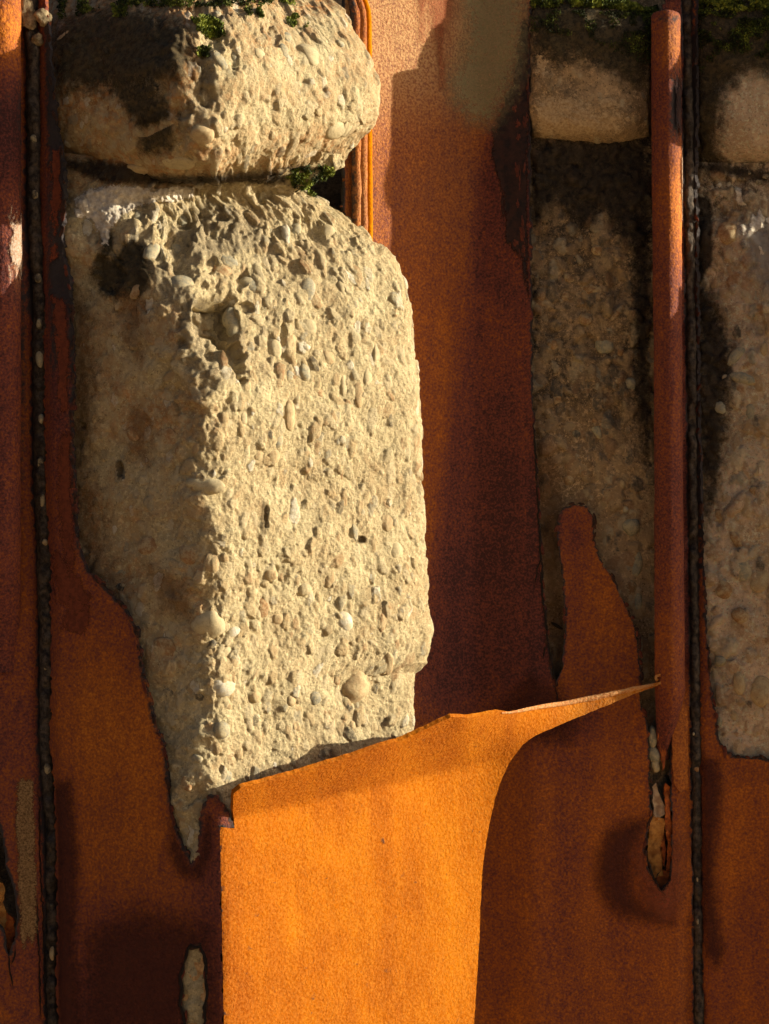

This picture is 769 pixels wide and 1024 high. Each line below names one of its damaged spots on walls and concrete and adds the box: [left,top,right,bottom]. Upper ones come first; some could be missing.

damp [51,2,196,155]
damp [529,137,652,454]
rust [505,679,561,711]
rust [536,720,573,738]
rust [647,704,689,889]